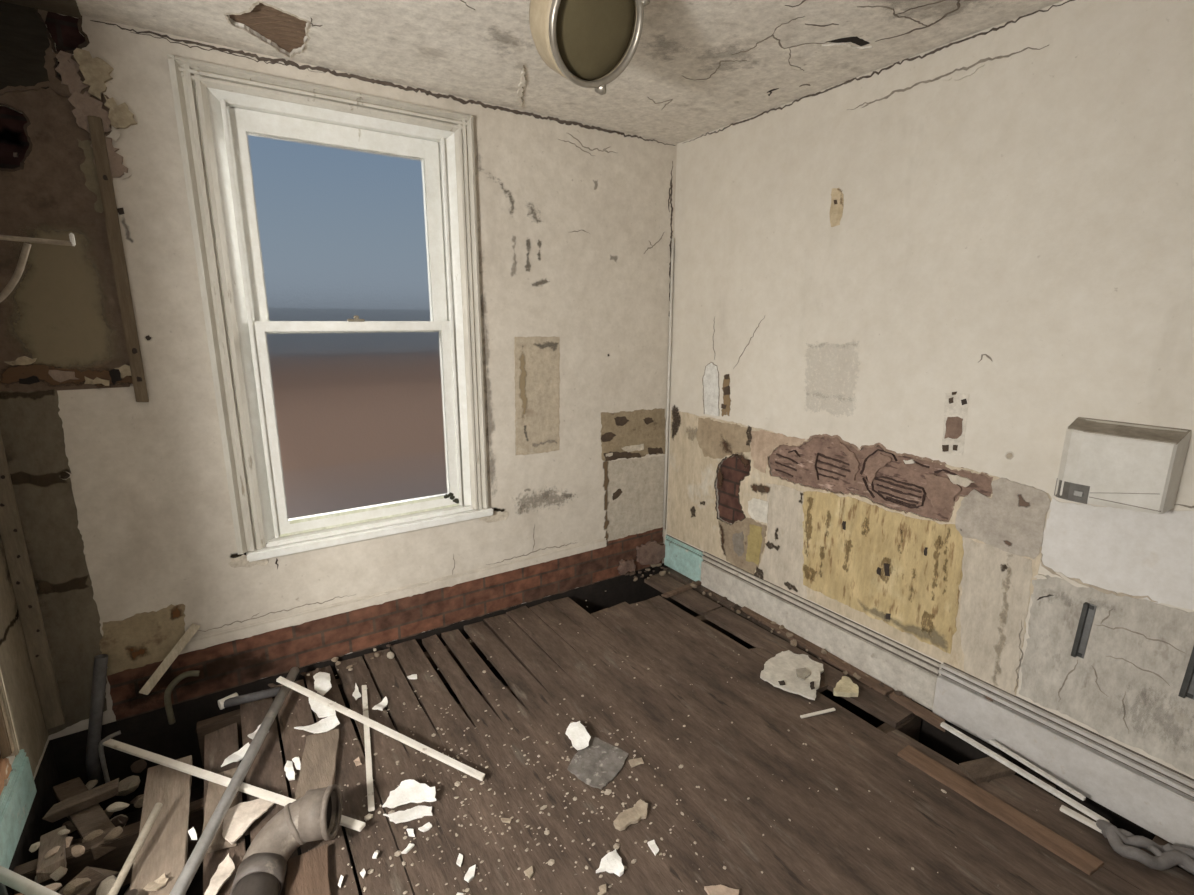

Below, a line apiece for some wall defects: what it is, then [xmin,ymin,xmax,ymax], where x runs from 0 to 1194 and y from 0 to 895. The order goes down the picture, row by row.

crack [90,0,1075,312]
flaking render [0,0,665,777]
spalling [941,392,970,455]
leakage [799,492,831,581]
leakage [843,518,870,572]
leakage [870,529,950,648]
flaking render [667,410,1194,777]
flaking render [0,757,12,795]
spalling [565,721,644,790]
peeling [382,779,436,854]
peeling [613,799,648,831]